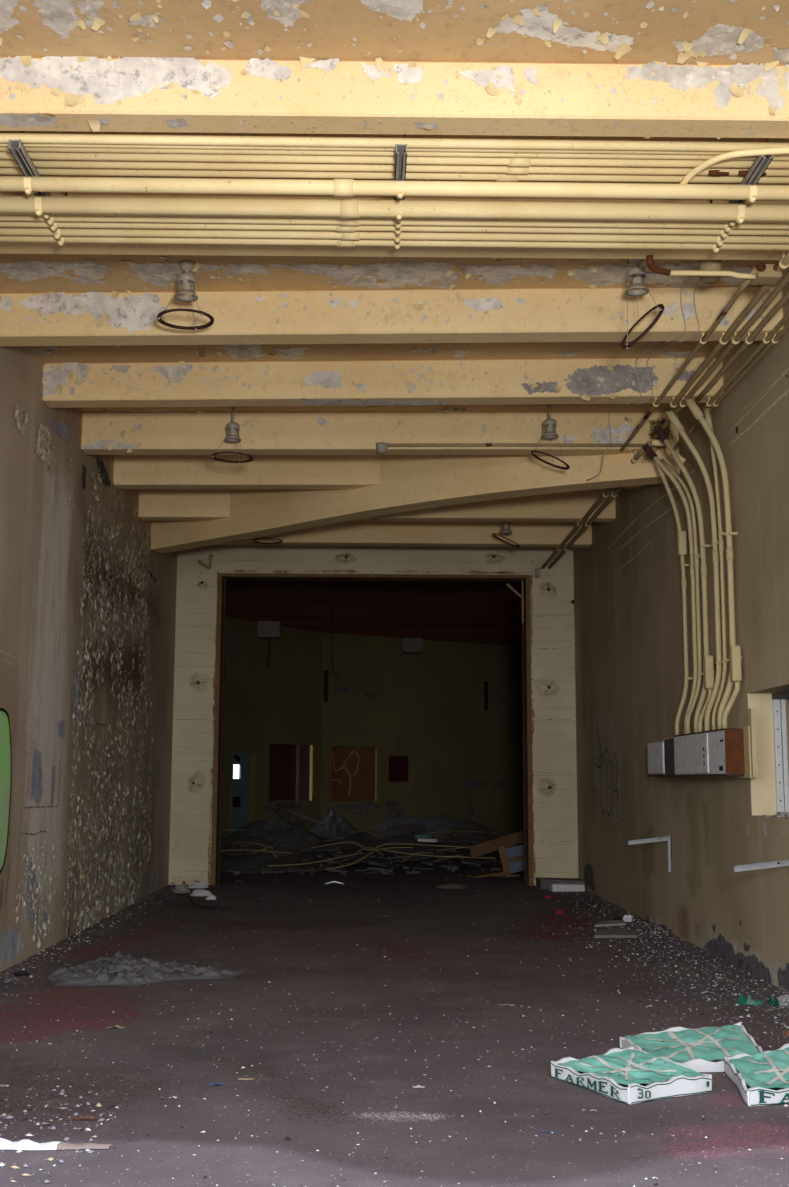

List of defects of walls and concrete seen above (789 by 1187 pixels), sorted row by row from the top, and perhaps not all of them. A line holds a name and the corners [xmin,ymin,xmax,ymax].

peeling [0,0,424,132]
peeling [361,0,487,39]
peeling [436,63,565,106]
peeling [476,0,789,131]
peeling [0,255,771,349]
peeling [32,344,312,396]
peeling [513,341,710,451]
peeling [0,403,216,967]